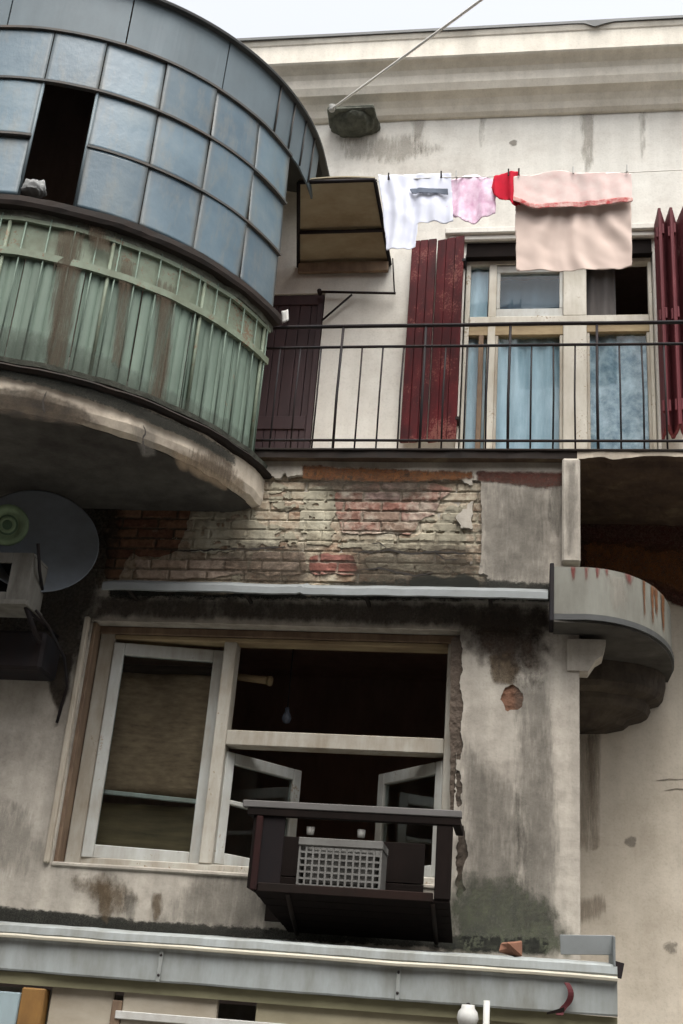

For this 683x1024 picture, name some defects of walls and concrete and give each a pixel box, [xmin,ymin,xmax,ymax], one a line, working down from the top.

corrosion [47,231,84,368]
corrosion [112,258,133,367]
corrosion [149,278,174,403]
damp [0,508,549,711]
spalling [97,475,487,589]
corrosion [571,542,683,630]
spalling [449,635,463,810]
spalling [500,685,523,711]
damp [0,879,548,954]
spalling [455,826,468,893]